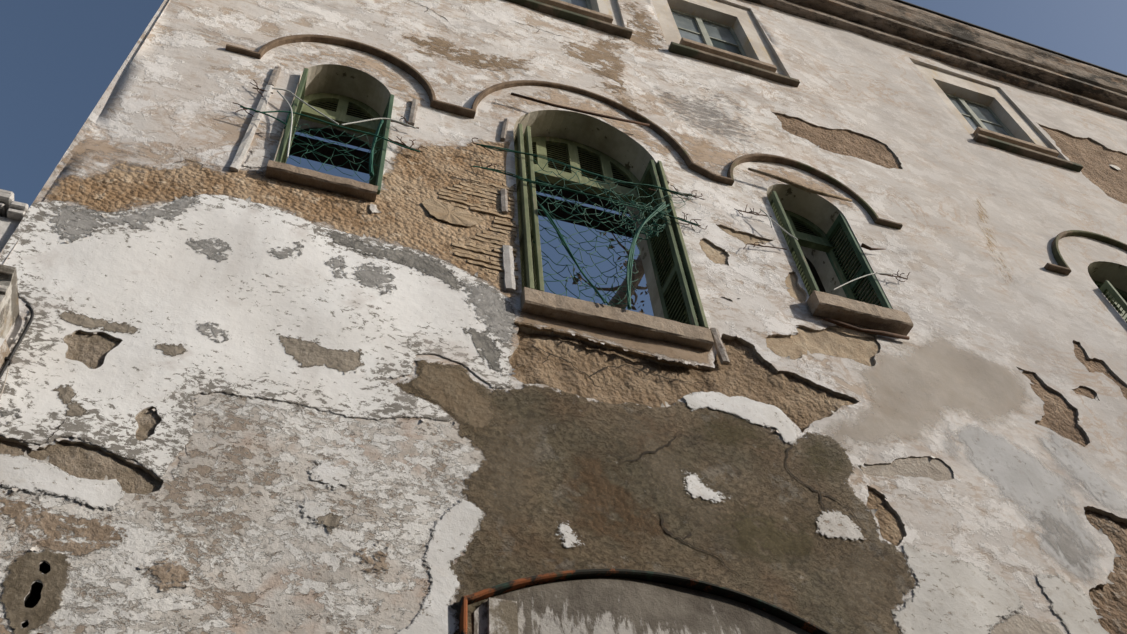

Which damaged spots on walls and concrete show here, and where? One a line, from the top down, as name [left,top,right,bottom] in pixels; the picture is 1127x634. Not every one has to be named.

flaking render [772,112,903,169]
flaking render [1036,122,1127,204]
peeling [0,140,1100,494]
flaking render [1073,340,1127,399]
peeling [0,488,128,634]
peeling [139,553,193,592]
peeling [314,512,344,535]
peeling [355,540,390,578]
spalling [859,455,954,546]
peeling [1032,511,1093,571]
flaking render [1084,506,1127,634]